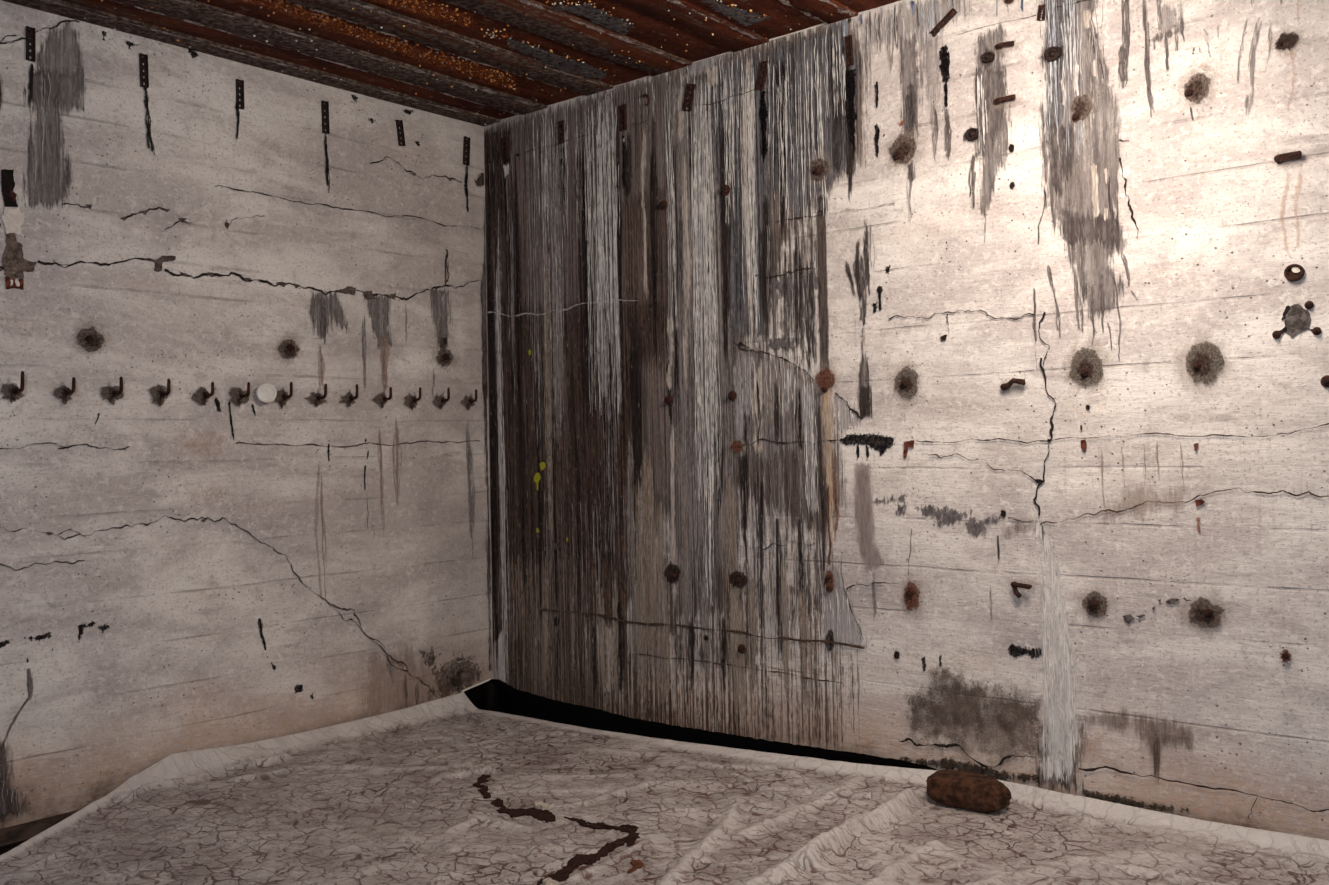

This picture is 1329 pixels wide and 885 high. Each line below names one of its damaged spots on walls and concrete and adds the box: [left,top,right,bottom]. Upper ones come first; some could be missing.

corrosion [237,0,519,93]
corrosion [701,0,771,27]
water stain [1237,0,1271,108]
crack [37,185,479,300]
water stain [1038,0,1200,361]
crack [0,442,130,450]
crack [236,439,480,447]
water stain [23,0,1012,749]
crack [889,310,1329,525]
crack [0,515,435,695]
water stain [899,521,1190,812]
water stain [0,669,33,818]